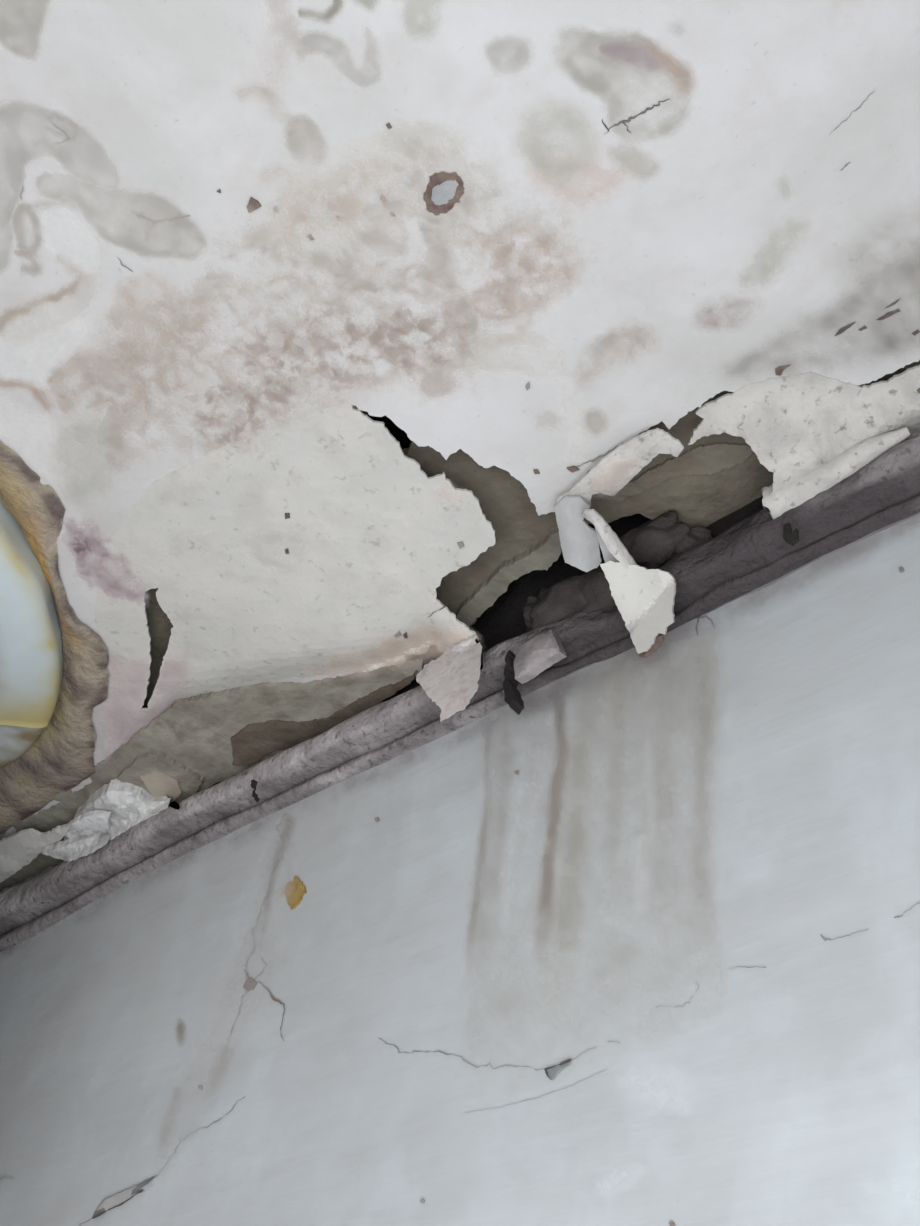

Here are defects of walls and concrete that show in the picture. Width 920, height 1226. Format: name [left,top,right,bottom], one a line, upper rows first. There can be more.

water stain [0,0,48,59]
water stain [486,37,530,72]
water stain [524,30,690,198]
water stain [0,102,573,498]
peeling [554,364,920,658]
peeling [0,401,496,890]
water stain [486,679,599,935]
water stain [469,821,510,968]
crack [156,1098,243,1176]
crack [378,1038,620,1113]